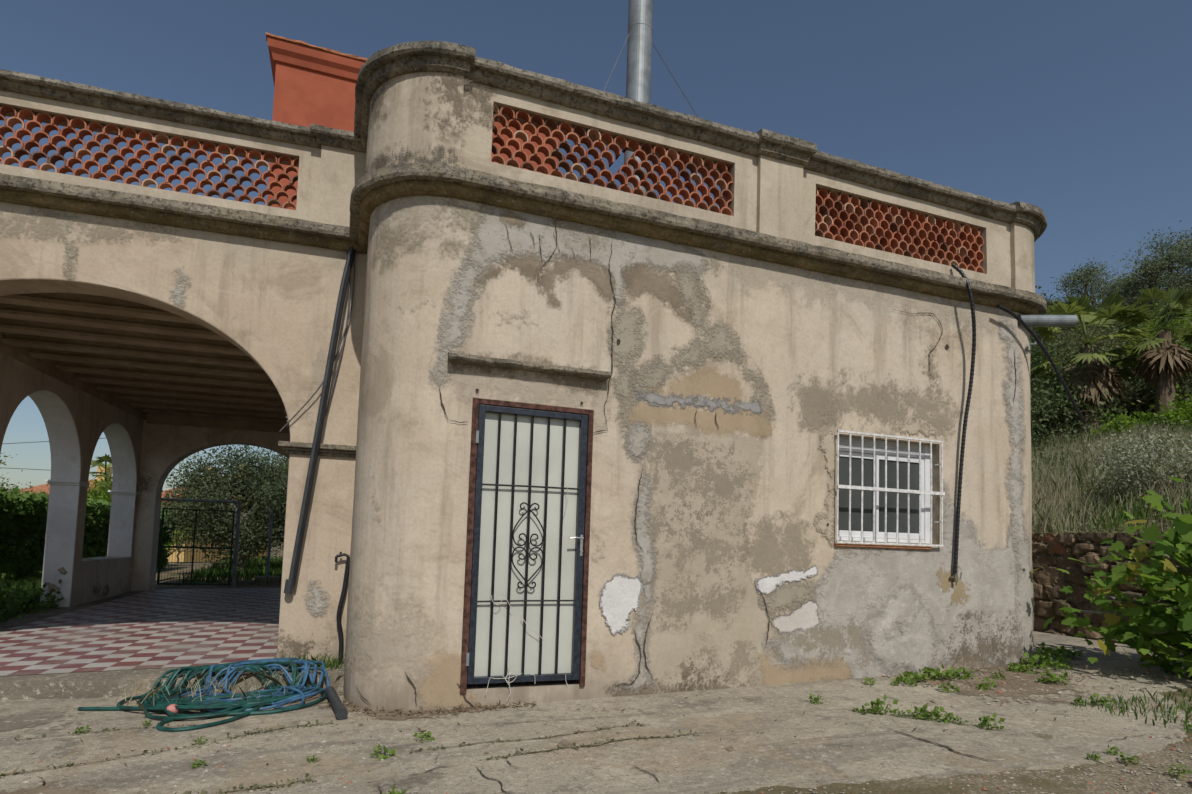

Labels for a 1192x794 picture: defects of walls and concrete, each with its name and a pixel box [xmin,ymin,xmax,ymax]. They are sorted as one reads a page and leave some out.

crack [506,219,616,433]
flaking render [594,384,611,430]
peeling [599,573,646,635]
crack [612,470,657,693]
peeling [755,565,819,595]
peeling [771,599,820,633]